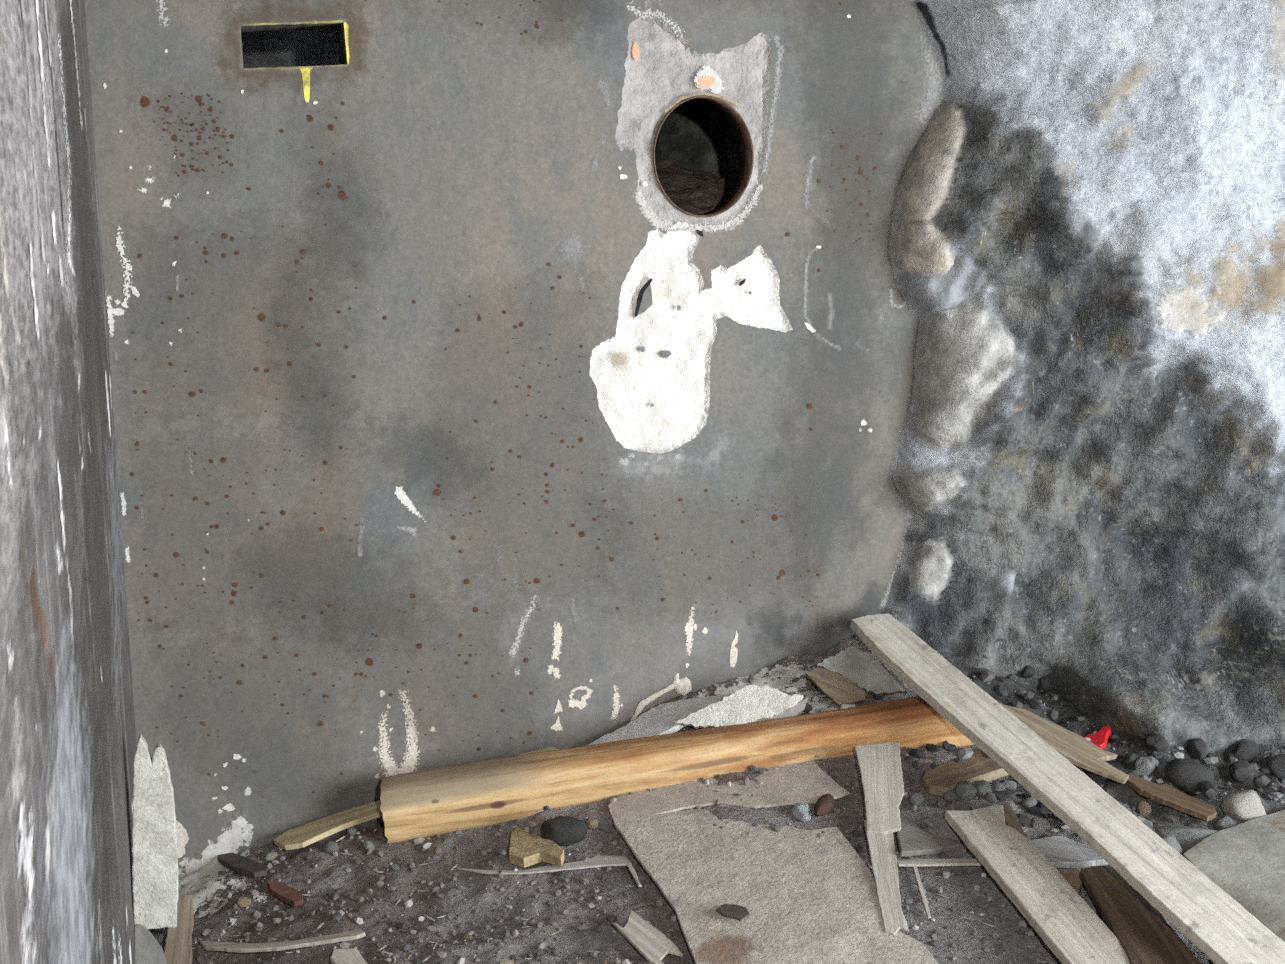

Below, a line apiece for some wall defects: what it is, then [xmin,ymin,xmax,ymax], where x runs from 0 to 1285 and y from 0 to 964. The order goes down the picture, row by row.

corrosion [141,93,234,178]
spalling [589,0,793,477]
water stain [819,89,1285,759]
peeling [176,820,189,858]